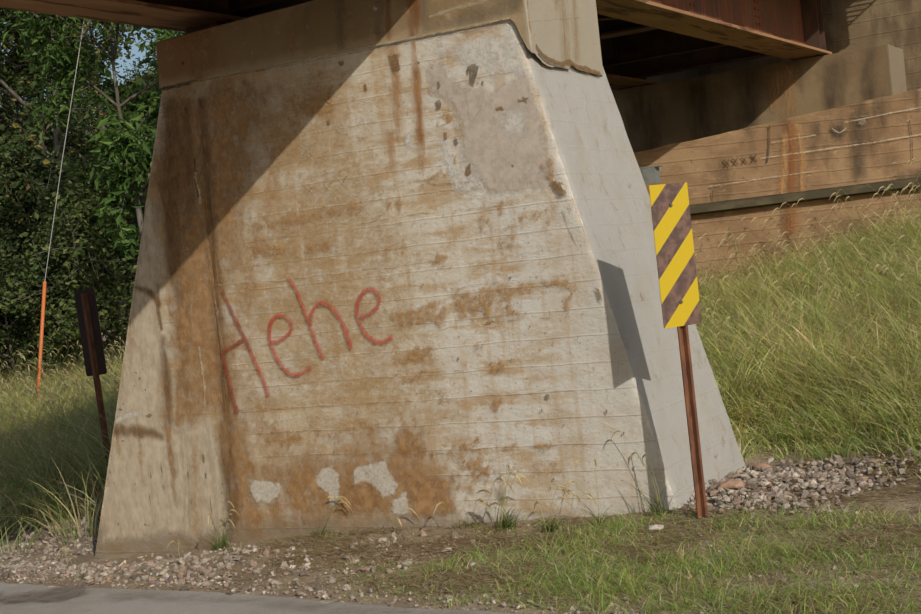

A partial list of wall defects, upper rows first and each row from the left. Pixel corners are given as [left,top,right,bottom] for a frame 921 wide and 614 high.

spalling [388,54,400,72]
spalling [466,64,483,87]
spalling [536,44,601,76]
corrosion [414,69,422,141]
spalling [435,81,458,145]
spalling [541,156,566,196]
leakage [114,85,496,529]
leakage [455,278,573,318]